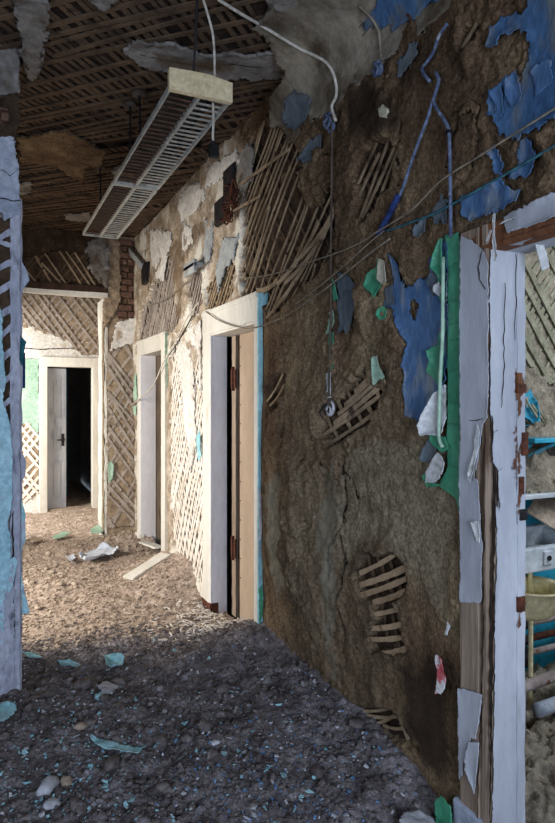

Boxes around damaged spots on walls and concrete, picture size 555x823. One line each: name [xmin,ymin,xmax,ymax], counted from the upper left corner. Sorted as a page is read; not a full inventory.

spalling [189,89,335,319]
spalling [0,0,282,643]
crack [319,461,360,614]
peeling [323,0,555,823]
corrosion [512,427,522,479]
corrosion [515,378,526,416]